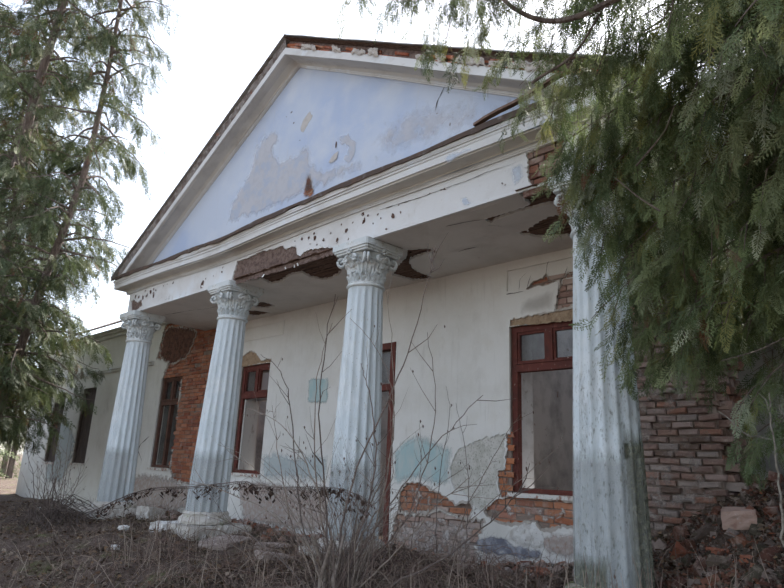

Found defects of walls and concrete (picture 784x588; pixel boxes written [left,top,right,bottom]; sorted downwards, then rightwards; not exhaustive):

flaking render [286,41,608,77]
peeling [231,134,355,219]
flaking render [486,139,565,223]
flaking render [232,205,401,284]
flaking render [391,248,439,281]
flaking render [510,271,573,326]
flaking render [516,213,572,238]
flaking render [132,324,217,510]
flaking render [242,350,271,367]
flaking render [624,227,735,537]
flaking render [390,432,574,566]